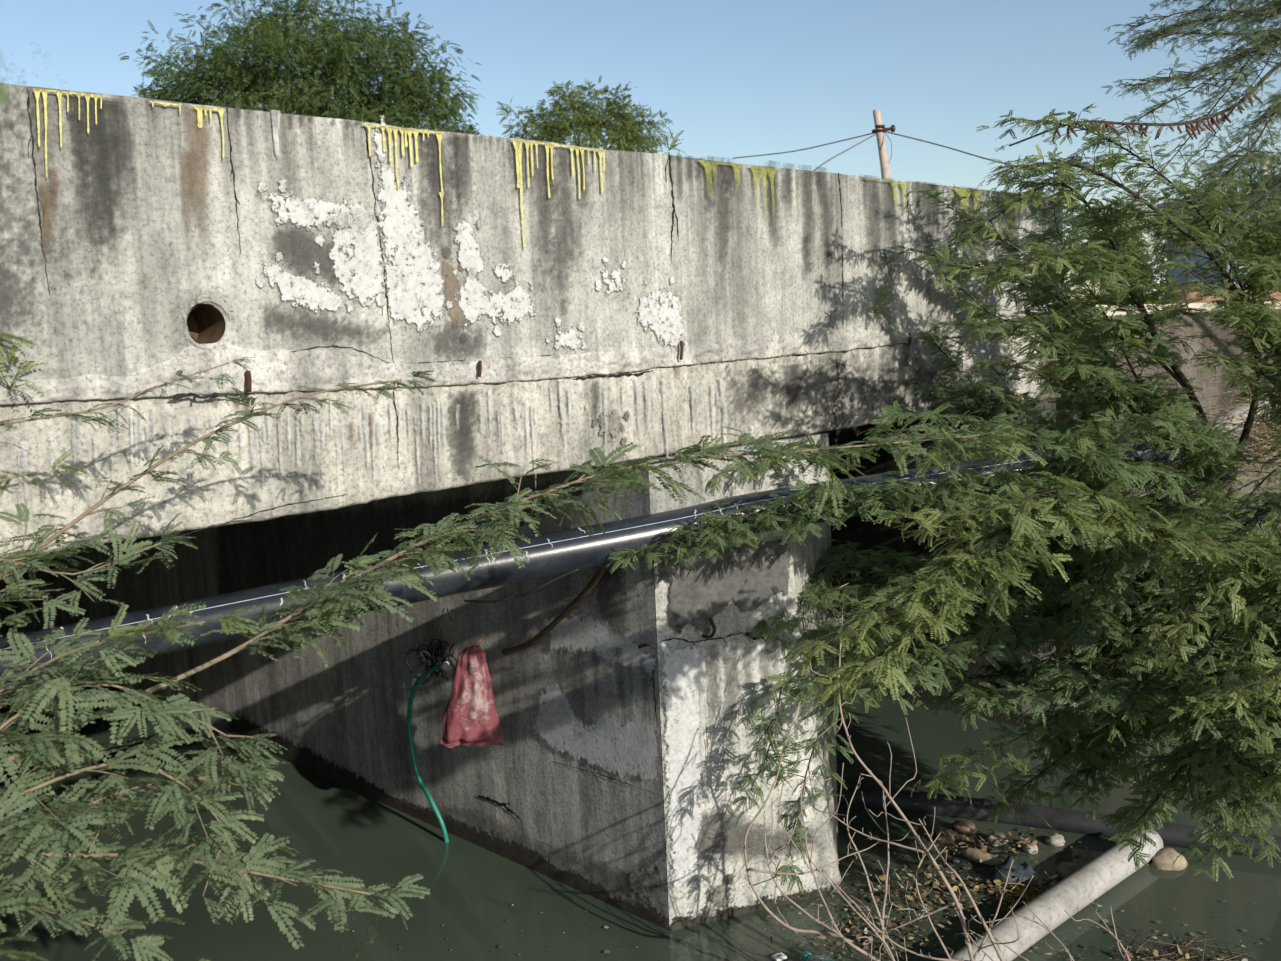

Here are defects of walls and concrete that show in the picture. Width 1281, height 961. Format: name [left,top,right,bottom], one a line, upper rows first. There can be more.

crack [26,87,50,294]
crack [227,106,241,251]
peeling [256,115,539,339]
damp [332,119,483,229]
damp [512,140,605,277]
crack [665,153,679,263]
damp [677,155,833,271]
crack [292,122,400,470]
peeling [546,317,588,352]
peeling [596,257,688,358]
peeling [224,539,845,931]